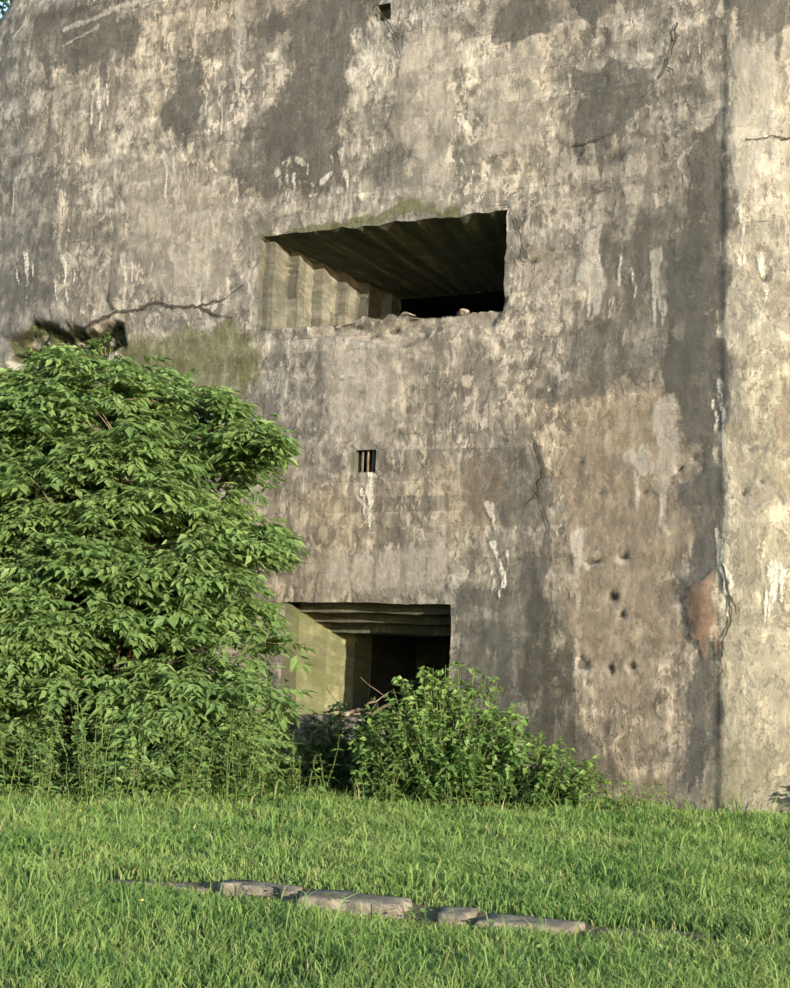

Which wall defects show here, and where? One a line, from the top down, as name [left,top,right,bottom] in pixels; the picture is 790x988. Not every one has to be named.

water stain [727,0,790,79]
crack [85,283,244,329]
water stain [758,253,774,300]
spalling [10,324,127,366]
water stain [663,107,745,793]
water stain [360,472,373,527]
rust [686,574,719,658]
crack [717,563,737,680]
water stain [764,560,787,621]